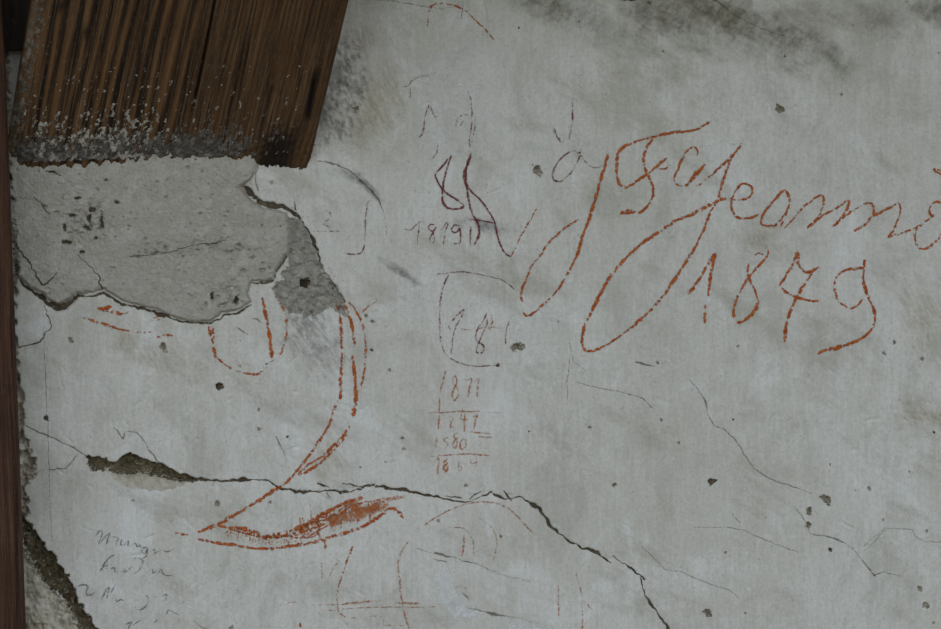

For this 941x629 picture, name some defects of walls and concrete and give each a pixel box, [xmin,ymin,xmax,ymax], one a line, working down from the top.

spalling [62,207,104,254]
spalling [271,217,348,318]
crack [22,377,670,629]